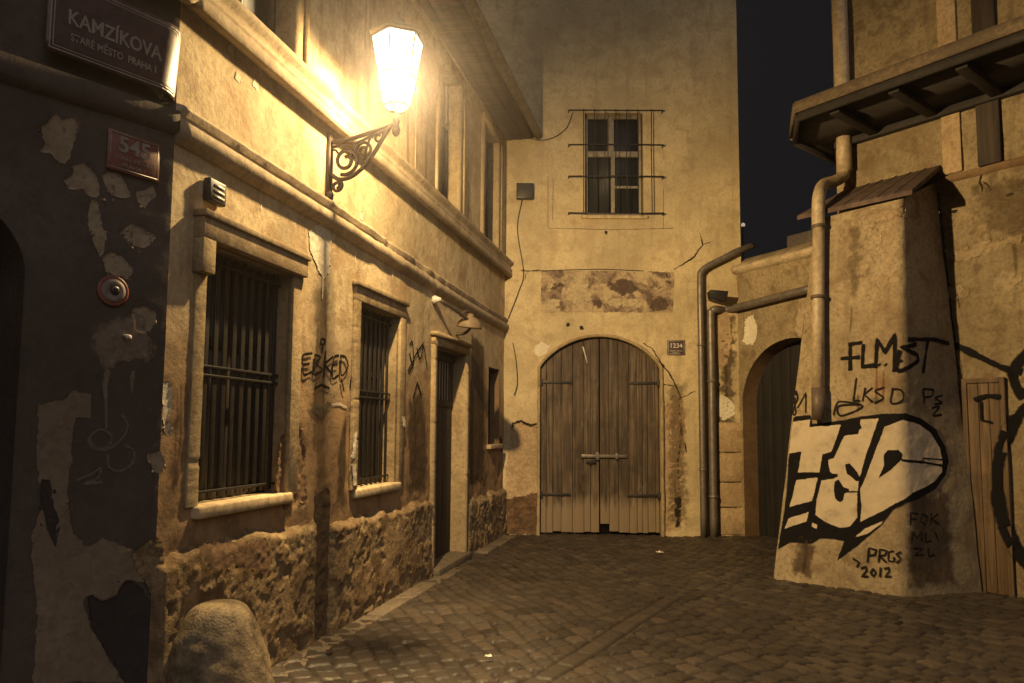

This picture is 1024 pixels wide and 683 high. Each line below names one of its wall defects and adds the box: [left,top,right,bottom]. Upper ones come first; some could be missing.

spalling [36,114,157,280]
spalling [309,224,332,299]
crack [673,235,710,270]
crack [511,420,537,429]
crack [643,343,695,494]
spalling [31,391,166,683]
spalling [199,538,272,576]
spalling [276,426,331,641]